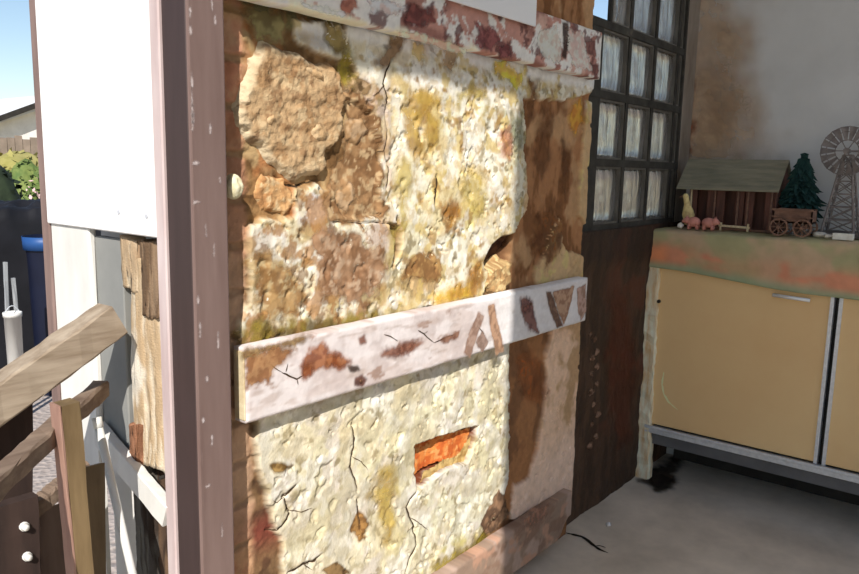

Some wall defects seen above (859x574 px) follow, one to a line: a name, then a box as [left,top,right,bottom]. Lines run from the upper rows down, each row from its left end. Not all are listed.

flaking render [253,174,295,216]
flaking render [311,75,390,308]
crack [336,63,390,229]
water stain [494,61,552,171]
water stain [531,212,562,264]
water stain [560,146,571,198]
water stain [690,22,736,155]
flaking render [465,236,512,358]
crack [265,485,312,531]
crack [349,426,367,524]
crack [405,492,428,572]
spalling [414,427,471,484]